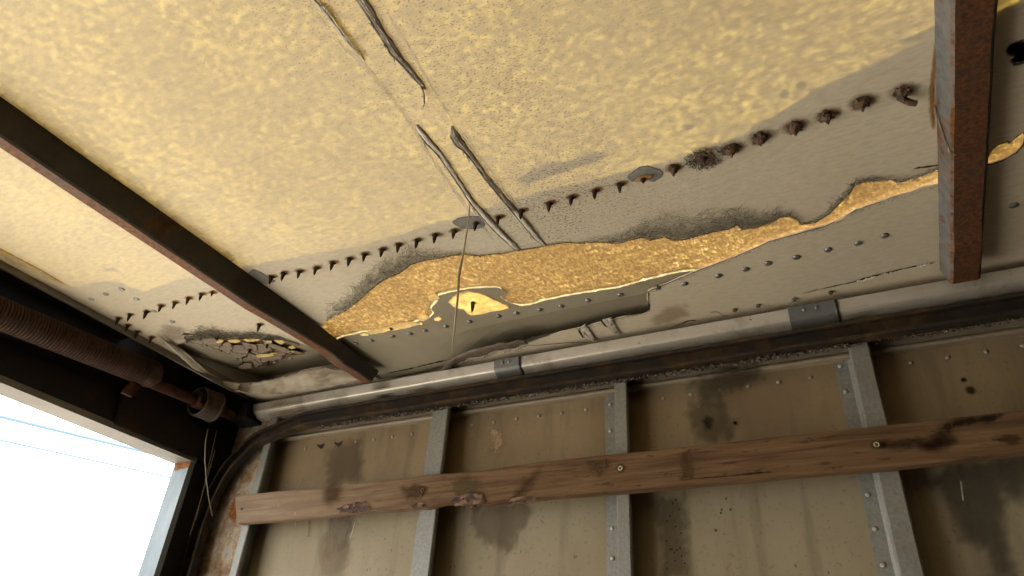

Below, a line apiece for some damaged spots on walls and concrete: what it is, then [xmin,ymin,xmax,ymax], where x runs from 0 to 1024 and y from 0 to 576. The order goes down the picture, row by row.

crack [313,0,546,251]
peeling [988,132,1024,165]
peeling [321,165,939,339]
damp [322,518,355,573]